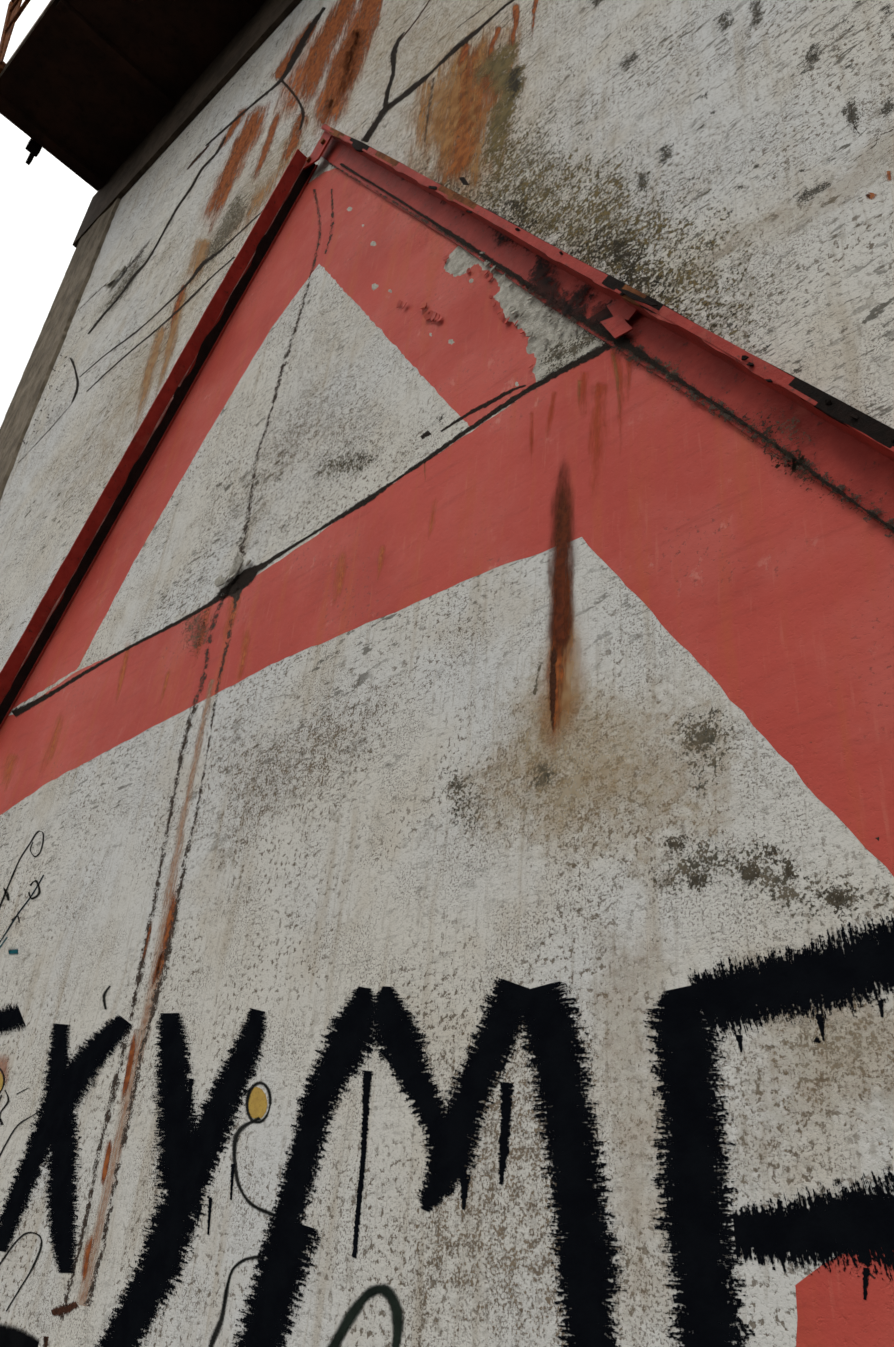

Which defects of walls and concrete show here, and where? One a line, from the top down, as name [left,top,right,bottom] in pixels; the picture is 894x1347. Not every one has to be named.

spalling [713,0,765,35]
rust [138,0,413,413]
rust [417,0,709,331]
mould [423,36,774,350]
spalling [635,142,674,192]
spalling [793,167,831,204]
spalling [839,93,894,133]
peeling [443,246,605,382]
rust [741,353,894,448]
rust [532,473,578,733]
crack [11,189,612,1347]
rust [530,758,557,793]